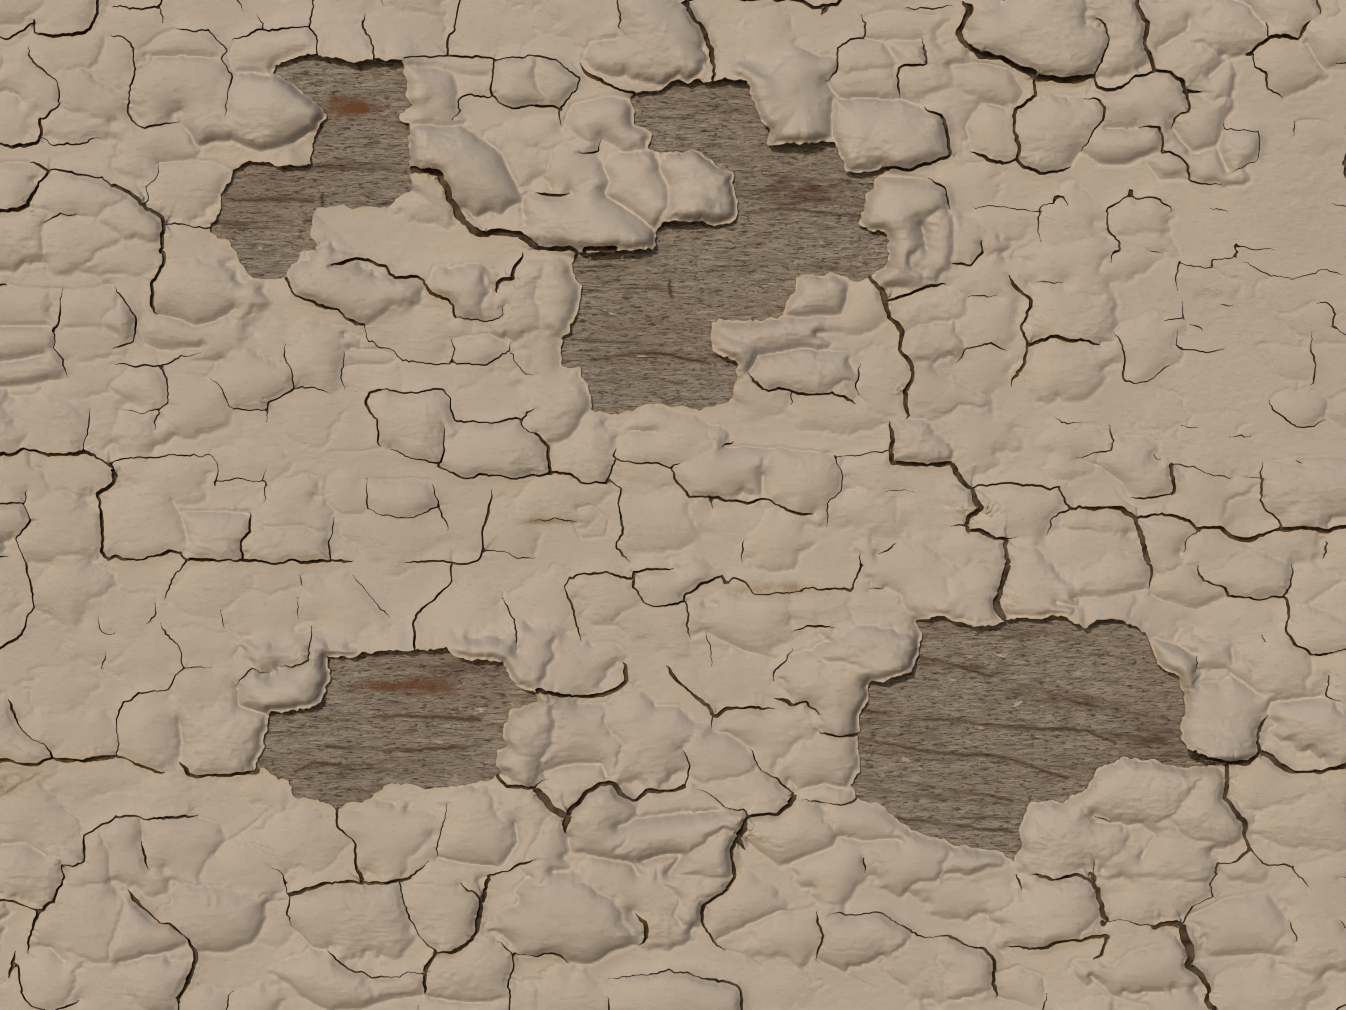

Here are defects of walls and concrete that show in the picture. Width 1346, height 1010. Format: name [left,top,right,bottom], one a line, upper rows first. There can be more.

peeling [192,0,949,415]
crack [0,0,1346,779]
crack [0,814,198,1010]
peeling [236,630,555,808]
crack [273,805,568,1010]
crack [494,750,857,1010]
peeling [774,615,1346,860]
crack [816,715,1346,1010]